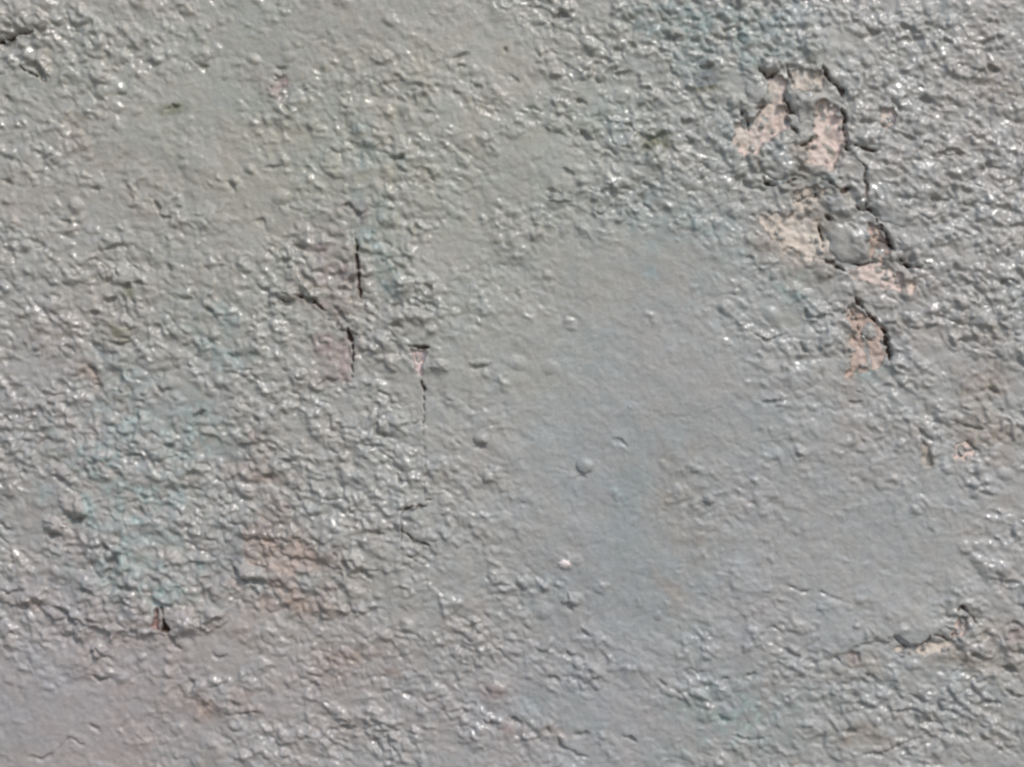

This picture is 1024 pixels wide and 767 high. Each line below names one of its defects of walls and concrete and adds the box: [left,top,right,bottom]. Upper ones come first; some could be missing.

spalling [733,56,939,295]
crack [822,66,932,269]
crack [355,234,369,308]
spalling [845,307,886,378]
crack [854,298,891,361]